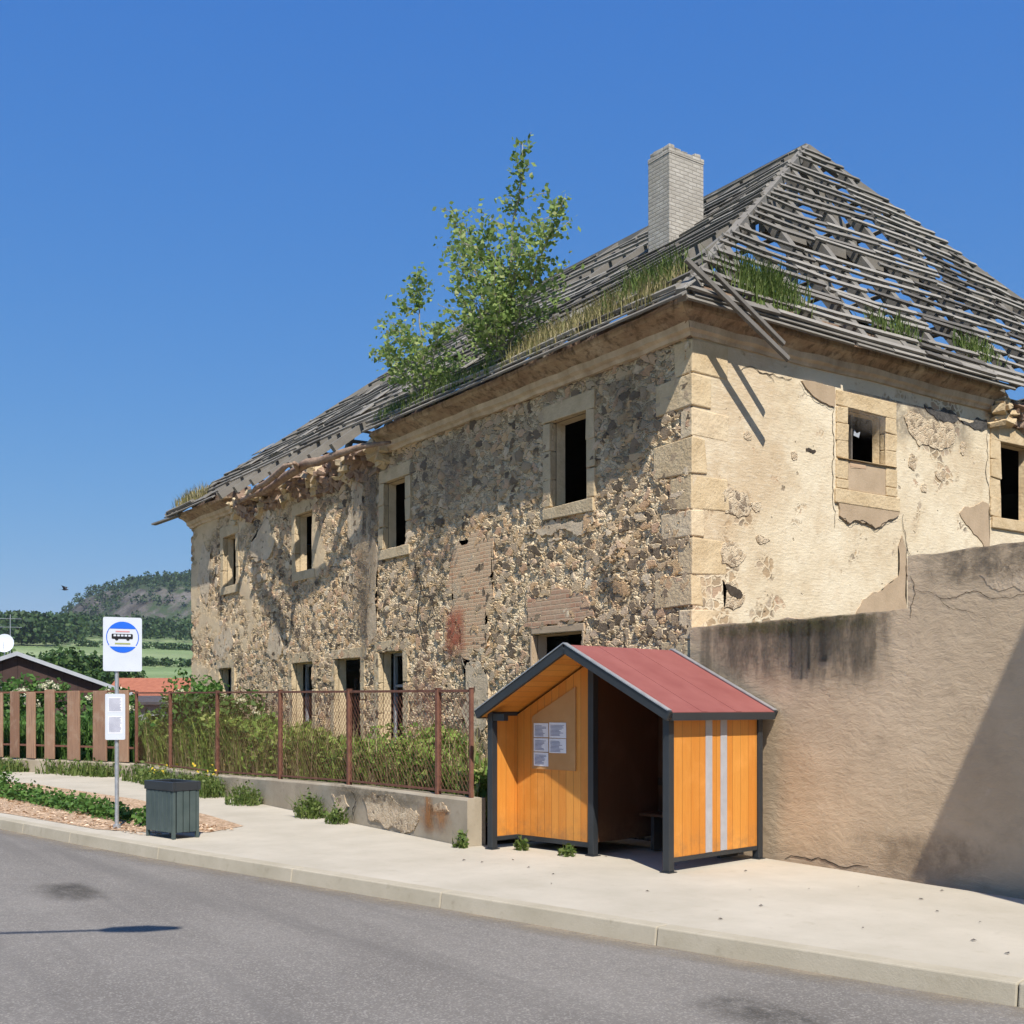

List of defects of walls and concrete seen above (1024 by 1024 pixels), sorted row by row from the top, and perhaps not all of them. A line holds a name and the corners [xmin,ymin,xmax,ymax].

spalling [903,399,1024,471]
spalling [723,487,761,518]
peeling [838,503,900,528]
crack [741,366,1024,618]
peeling [959,502,990,547]
spalling [723,580,745,610]
peeling [856,536,908,614]
leakage [715,613,875,675]
spalling [331,794,350,812]
spalling [363,793,449,834]